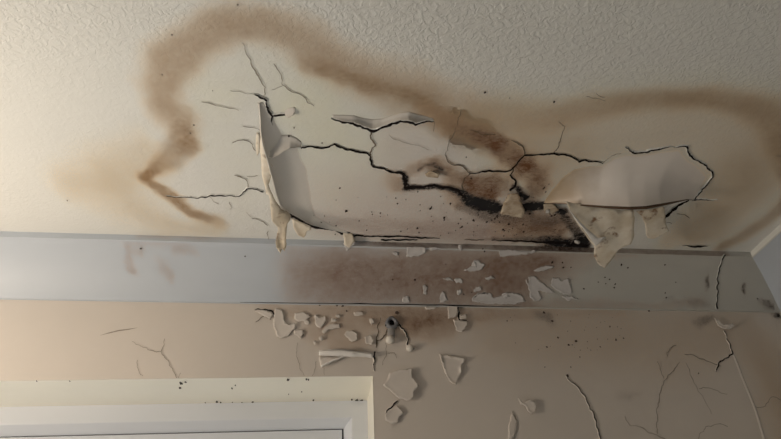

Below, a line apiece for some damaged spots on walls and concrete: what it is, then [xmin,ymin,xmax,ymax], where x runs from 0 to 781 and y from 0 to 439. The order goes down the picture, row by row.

crack [203,45,314,151]
leakage [43,0,781,351]
crack [301,112,717,224]
crack [166,175,268,236]
crack [290,214,440,241]
peeling [393,246,439,258]
peeling [499,249,535,257]
crack [465,239,588,247]
peeling [443,260,578,305]
peeling [255,308,374,367]
peeling [425,291,468,332]
peeling [383,368,419,424]